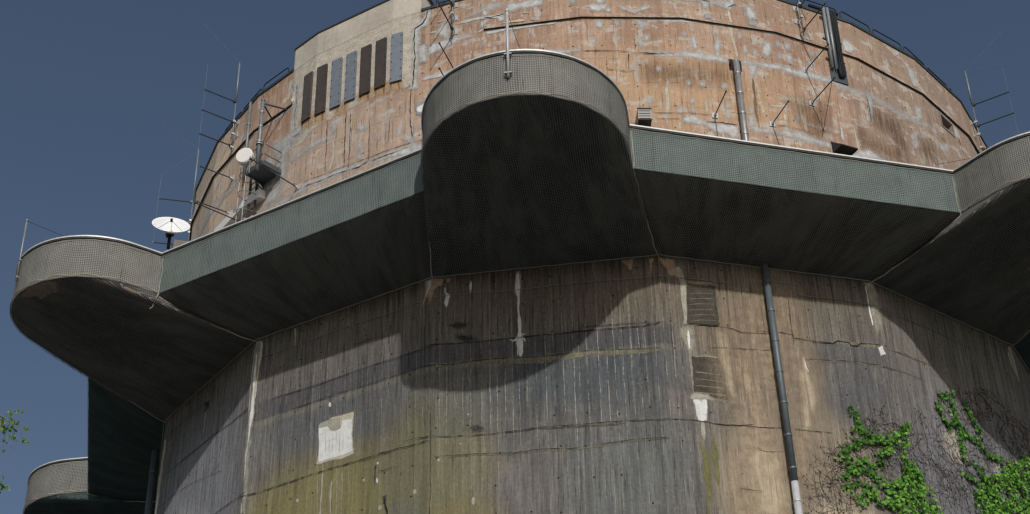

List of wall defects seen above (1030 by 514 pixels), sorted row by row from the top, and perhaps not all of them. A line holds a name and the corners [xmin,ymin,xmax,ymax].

leakage [509,271,525,357]
leakage [690,287,792,514]
leakage [778,288,817,480]